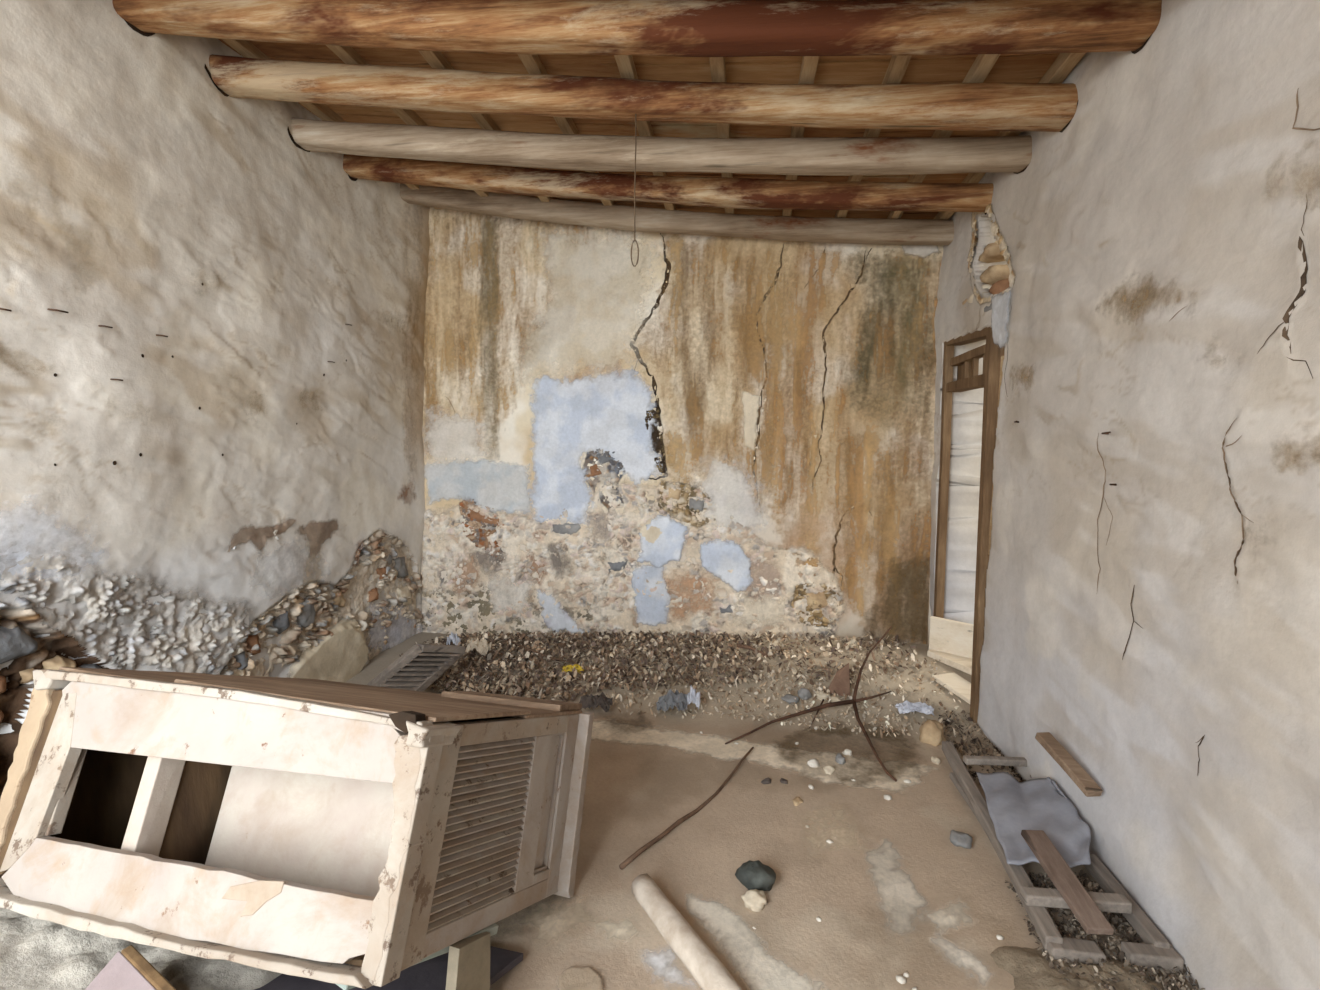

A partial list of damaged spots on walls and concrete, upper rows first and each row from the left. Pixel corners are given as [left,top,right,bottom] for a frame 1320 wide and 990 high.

crack [1292,90,1320,131]
flaking render [0,448,846,799]
leakage [406,212,551,450]
crack [629,233,671,480]
crack [753,244,825,510]
leakage [655,238,941,644]
crack [812,248,872,486]
crack [1097,433,1113,587]
crack [1122,585,1142,660]
crack [1222,419,1252,584]
crack [1257,194,1313,378]